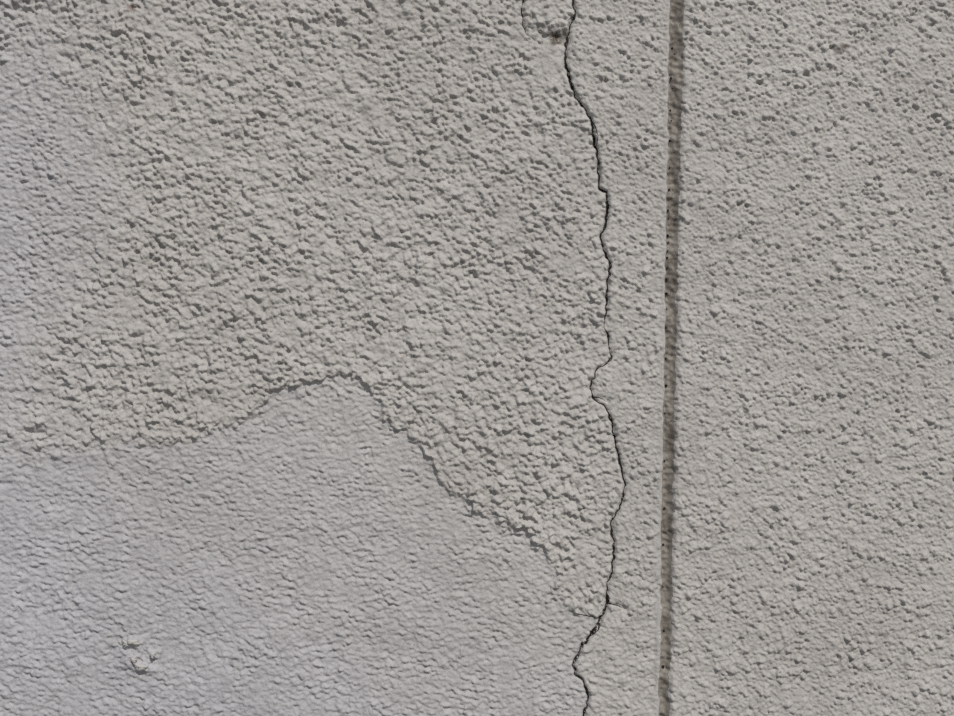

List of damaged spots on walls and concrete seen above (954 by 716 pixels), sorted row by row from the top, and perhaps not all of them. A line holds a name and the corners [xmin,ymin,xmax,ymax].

flaking render [0,48,111,404]
crack [564,0,626,716]
flaking render [0,369,600,716]